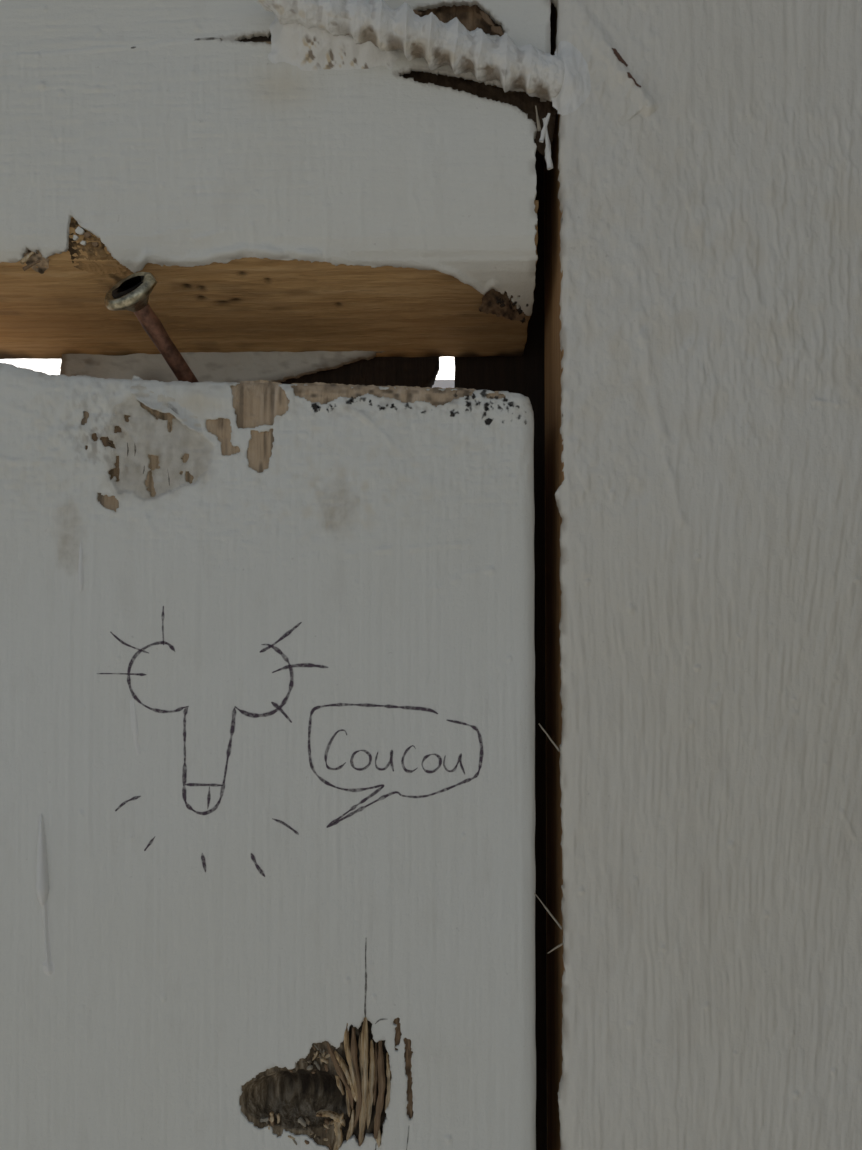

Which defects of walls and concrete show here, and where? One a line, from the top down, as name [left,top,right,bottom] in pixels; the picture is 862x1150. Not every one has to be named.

peeling [413,5,504,37]
peeling [68,218,126,275]
peeling [130,376,506,473]
peeling [81,411,160,497]
peeling [179,454,194,484]
peeling [97,493,119,512]
hole [239,1017,414,1150]